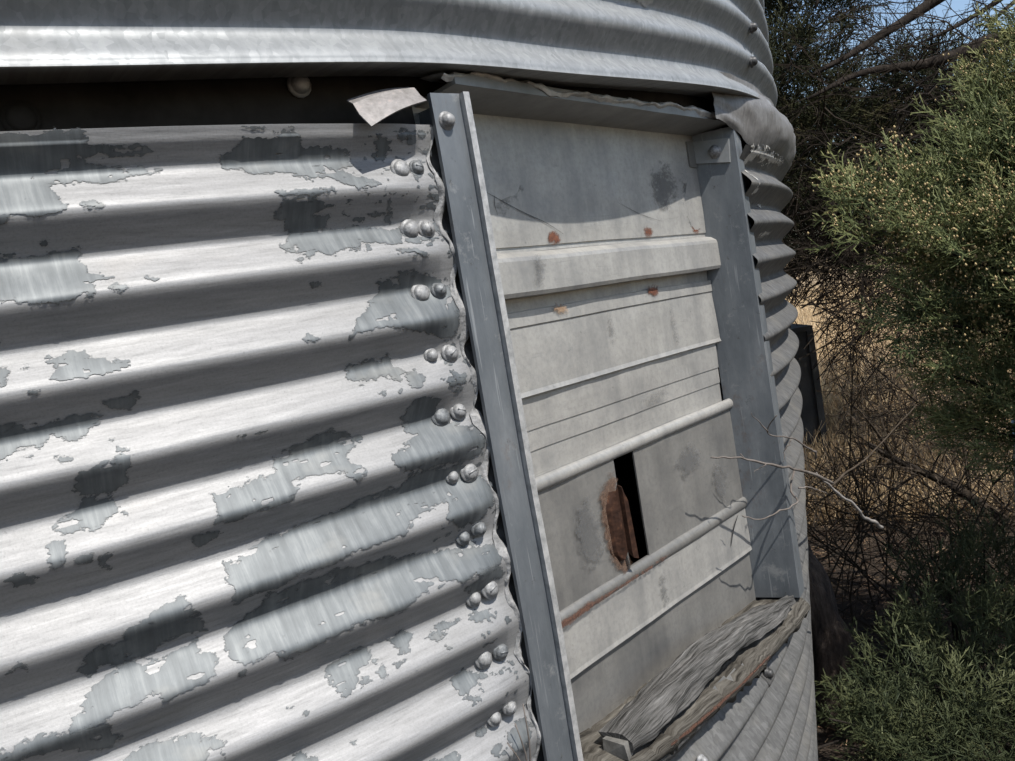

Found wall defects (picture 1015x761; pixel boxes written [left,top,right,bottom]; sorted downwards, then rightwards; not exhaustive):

peeling [0,128,163,225]
peeling [219,126,452,263]
peeling [0,239,130,306]
peeling [348,269,472,393]
peeling [0,350,512,761]
corrosion [561,477,664,628]
peeling [450,660,526,714]
peeling [491,704,534,758]